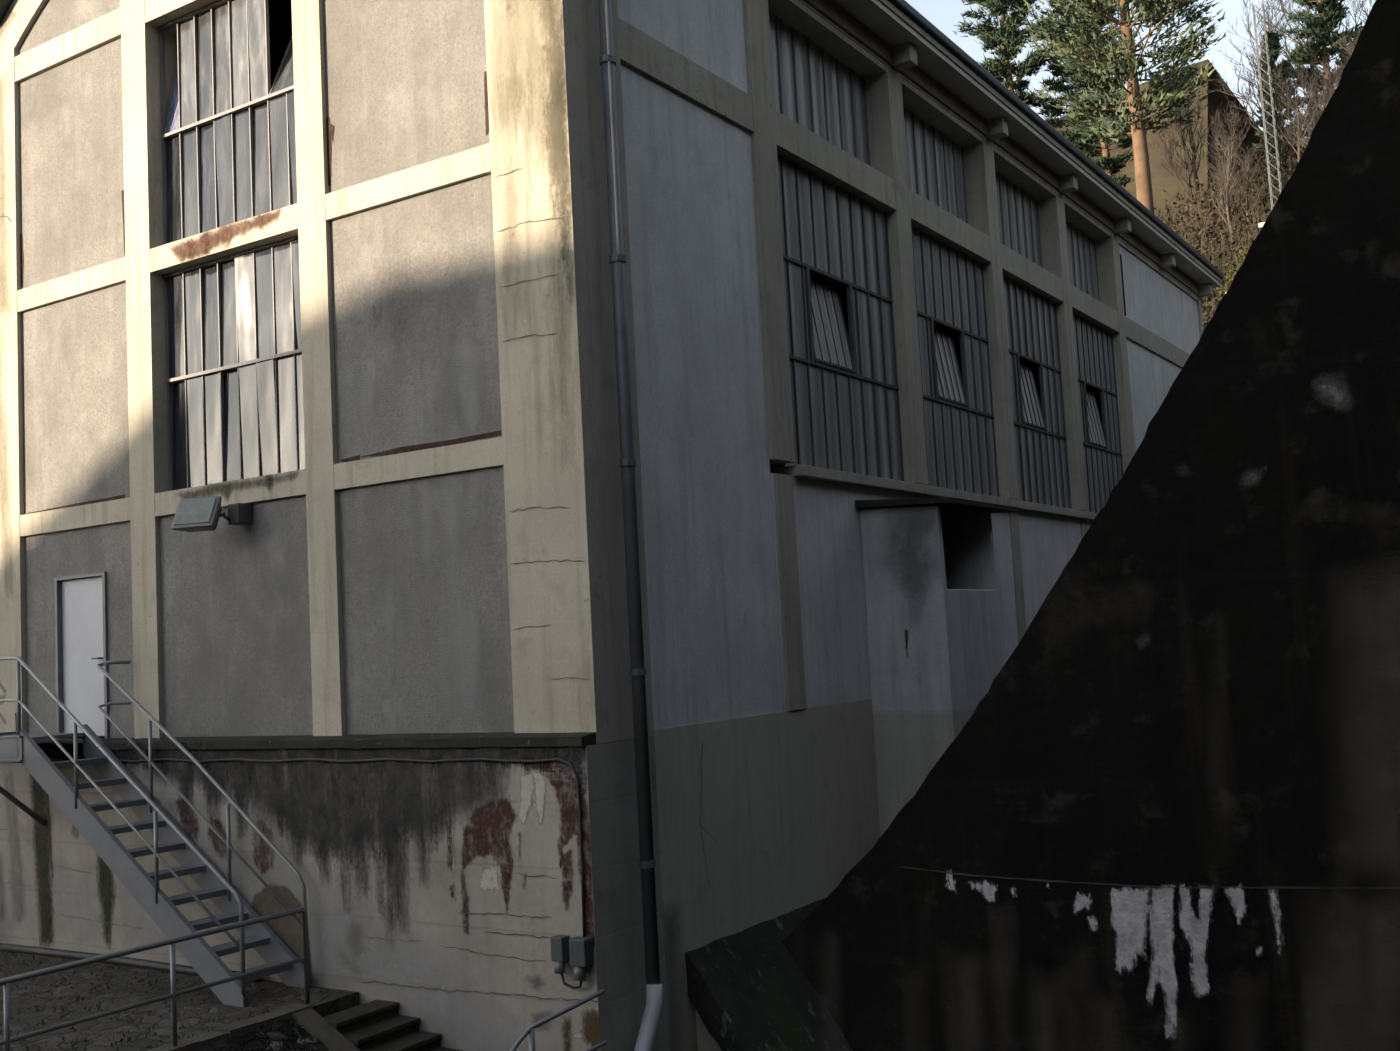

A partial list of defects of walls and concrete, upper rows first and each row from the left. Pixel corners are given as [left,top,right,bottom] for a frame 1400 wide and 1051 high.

damp [510,0,567,239]
corrosion [171,209,280,261]
damp [0,775,53,944]
damp [42,750,86,760]
damp [97,856,114,944]
damp [111,746,587,922]
peeling [446,762,595,947]